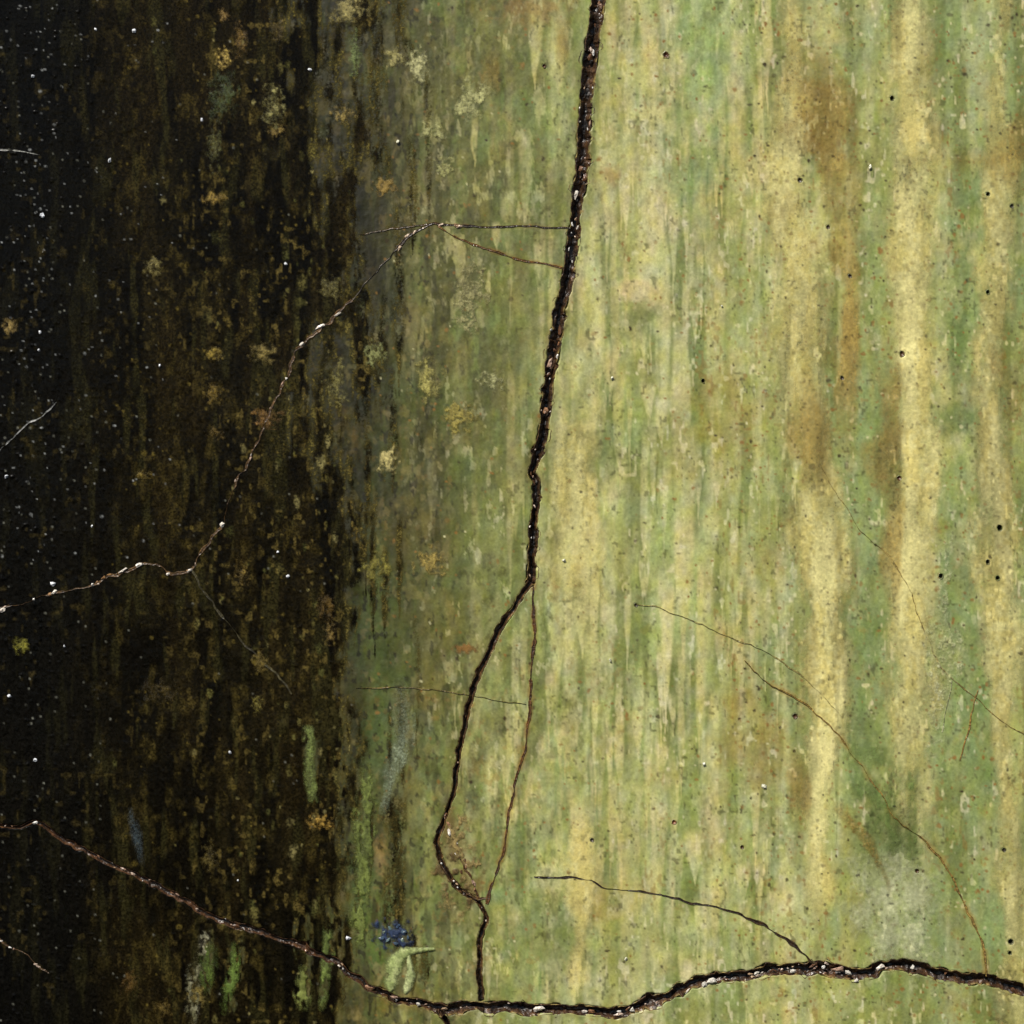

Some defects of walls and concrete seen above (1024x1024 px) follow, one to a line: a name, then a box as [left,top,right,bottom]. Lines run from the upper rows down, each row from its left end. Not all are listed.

crack [0,402,56,450]
crack [0,509,292,694]
damp [0,0,431,1024]
crack [227,0,611,1000]
crack [637,604,815,689]
crack [744,660,852,755]
crack [857,761,911,831]
crack [820,464,1024,760]
crack [0,820,1024,1024]